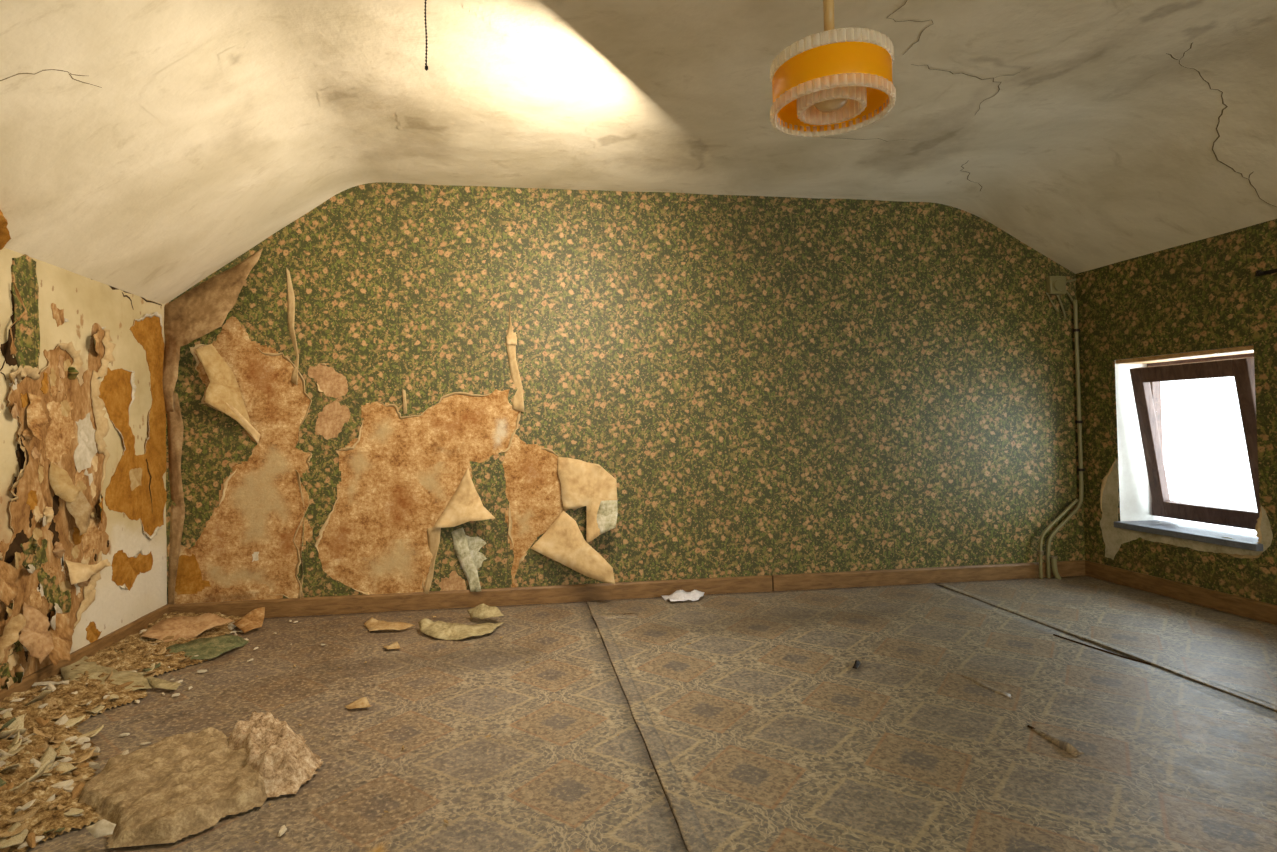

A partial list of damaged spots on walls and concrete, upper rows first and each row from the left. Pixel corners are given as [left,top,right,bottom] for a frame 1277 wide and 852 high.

crack [0,69,102,88]
crack [886,0,1028,115]
crack [1166,42,1277,207]
flaking render [0,210,11,250]
peeling [51,303,69,327]
peeling [9,312,167,630]
flaking render [337,403,405,514]
flaking render [488,411,515,455]
flaking render [198,435,303,600]
flaking render [349,534,433,595]
peeling [0,632,28,690]
peeling [86,621,102,643]